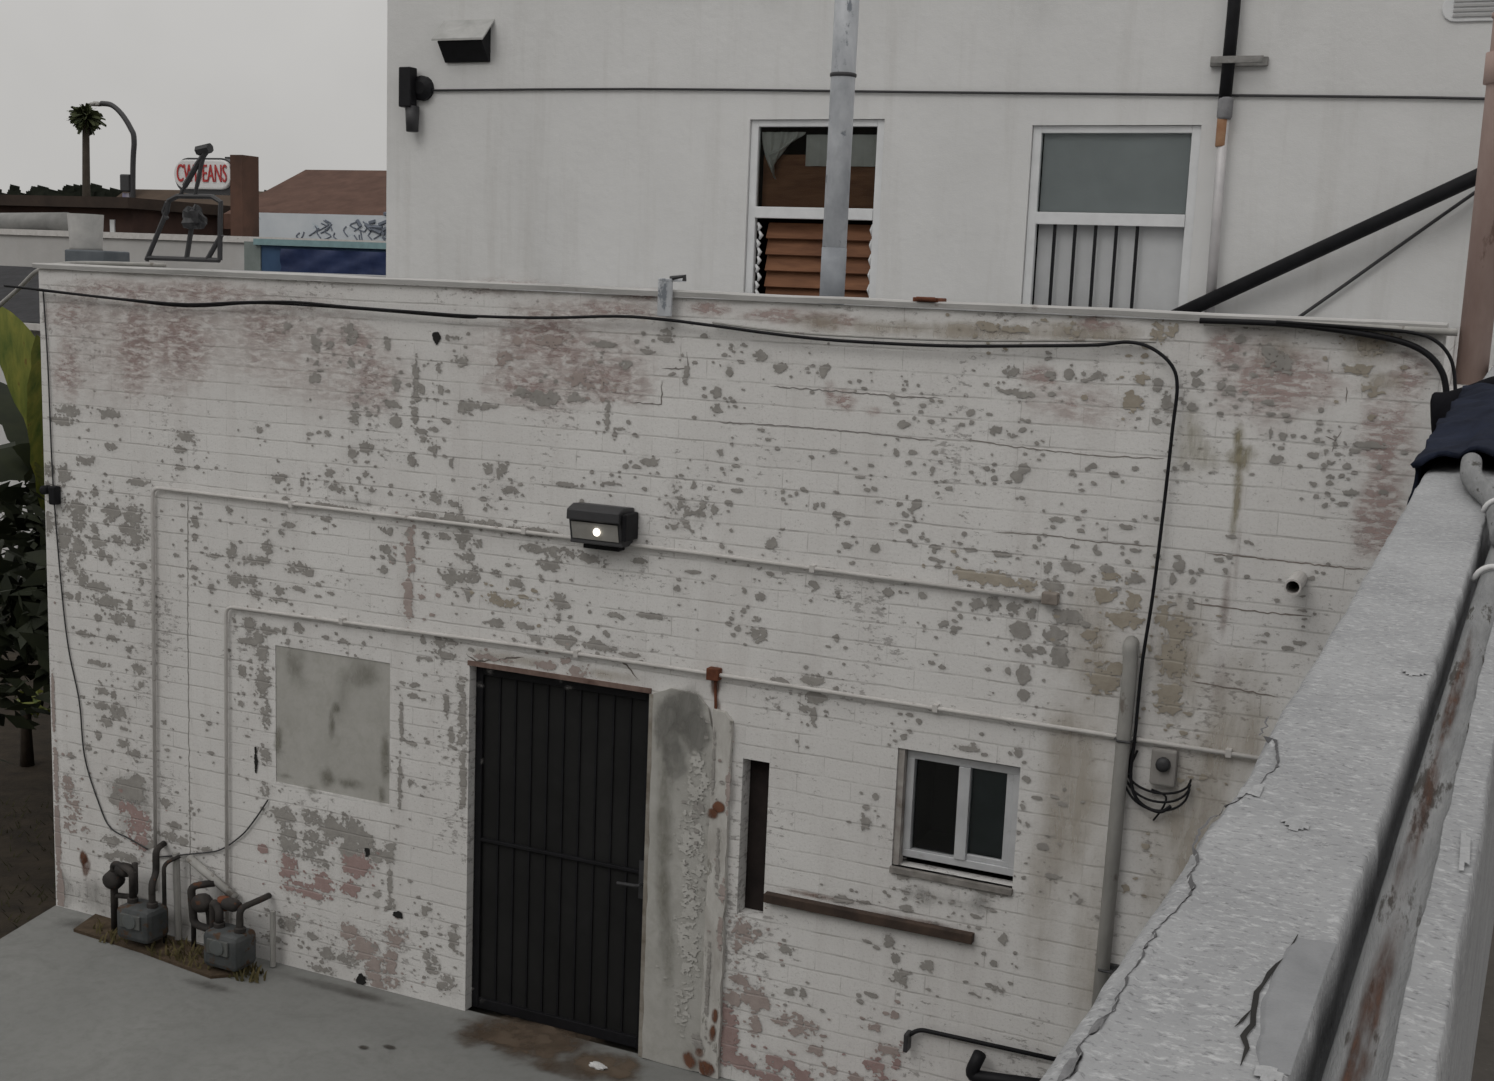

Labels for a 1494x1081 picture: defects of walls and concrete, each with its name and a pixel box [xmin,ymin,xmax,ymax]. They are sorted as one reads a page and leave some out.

peeling [775,313,1408,737]
water stain [1231,431,1247,522]
peeling [45,313,831,997]
water stain [655,690,709,774]
peeling [765,634,853,749]
rust [1440,650,1470,739]
rust [1411,757,1437,843]
peeling [656,710,939,1081]
crack [1062,681,1280,1081]
rust [683,1009,717,1076]
crack [1234,934,1298,1066]
rust [1341,949,1392,1081]